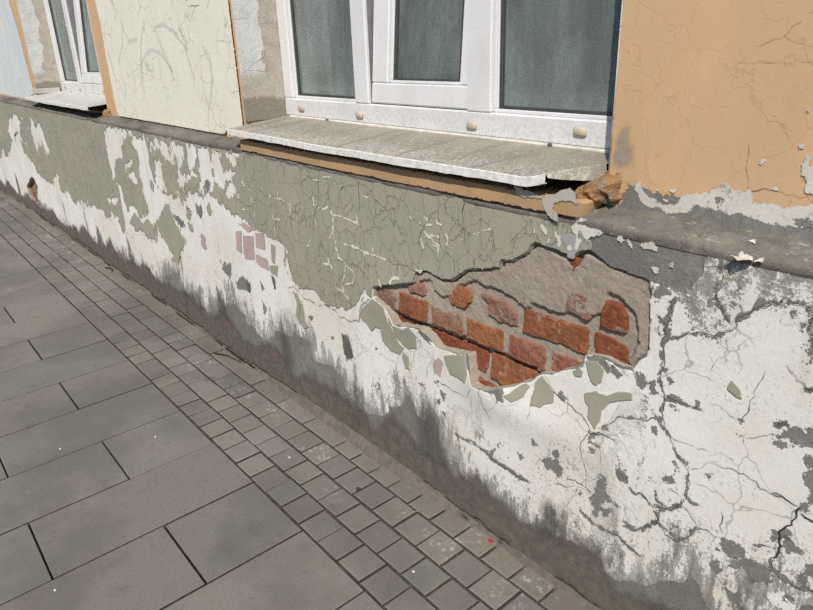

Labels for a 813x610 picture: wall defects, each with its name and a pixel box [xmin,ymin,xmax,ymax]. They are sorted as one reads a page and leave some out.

peeling [26,117,49,155]
peeling [513,185,578,221]
peeling [617,181,813,241]
peeling [617,235,658,251]
crack [37,212,298,394]
flaking render [376,213,651,387]
water stain [0,178,656,610]
crack [546,257,813,592]
crack [454,433,530,484]
crack [422,480,516,550]
crack [554,576,600,609]
peeling [757,586,801,610]